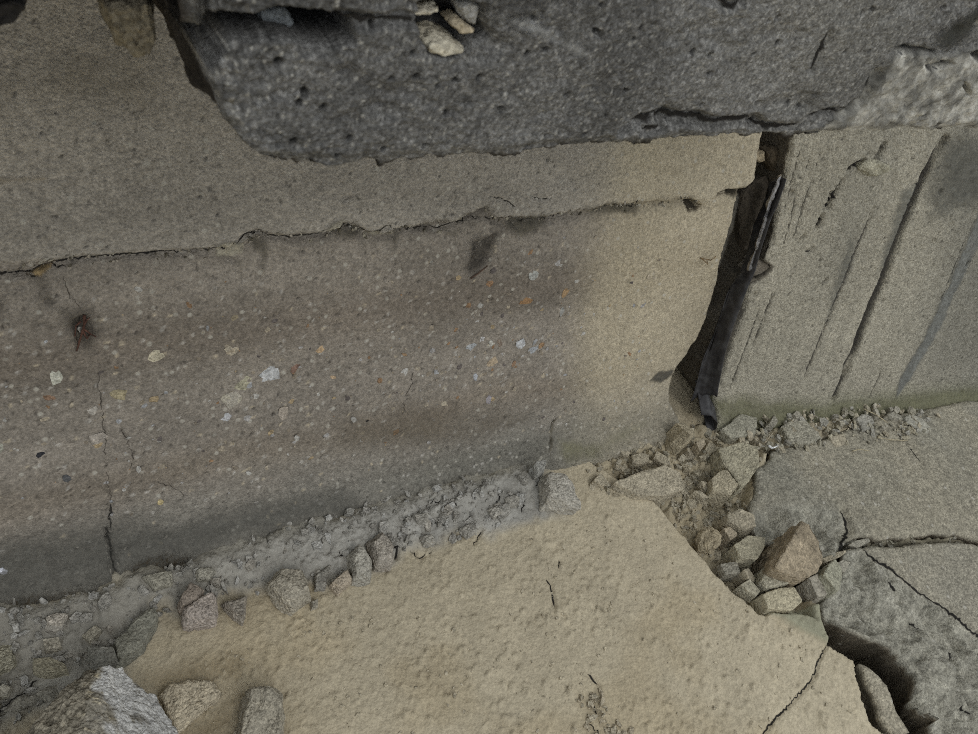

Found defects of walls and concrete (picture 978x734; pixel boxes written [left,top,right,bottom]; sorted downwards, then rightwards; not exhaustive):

crack [720,0,738,9]
crack [0,196,558,349]
spalling [40,370,63,422]
spalling [148,345,168,362]
spalling [208,346,301,422]
spalling [391,292,586,434]
crack [97,374,134,572]
crack [839,513,978,637]